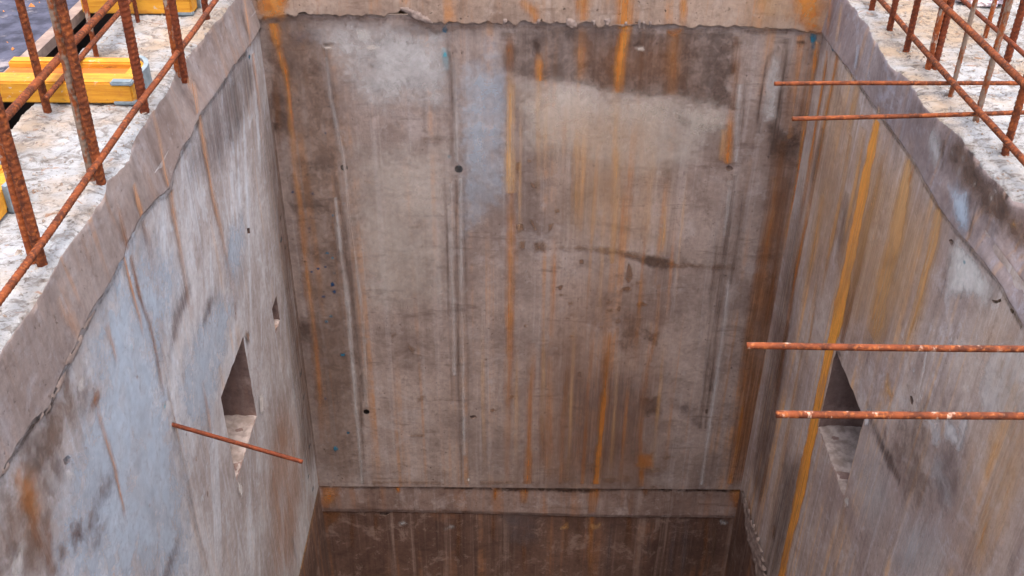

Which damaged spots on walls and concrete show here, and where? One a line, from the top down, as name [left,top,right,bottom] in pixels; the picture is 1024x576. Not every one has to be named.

corrosion [616,0,629,88]
damp [531,35,737,130]
corrosion [786,42,837,239]
damp [576,247,689,291]
corrosion [773,119,880,576]
crack [9,396,56,463]